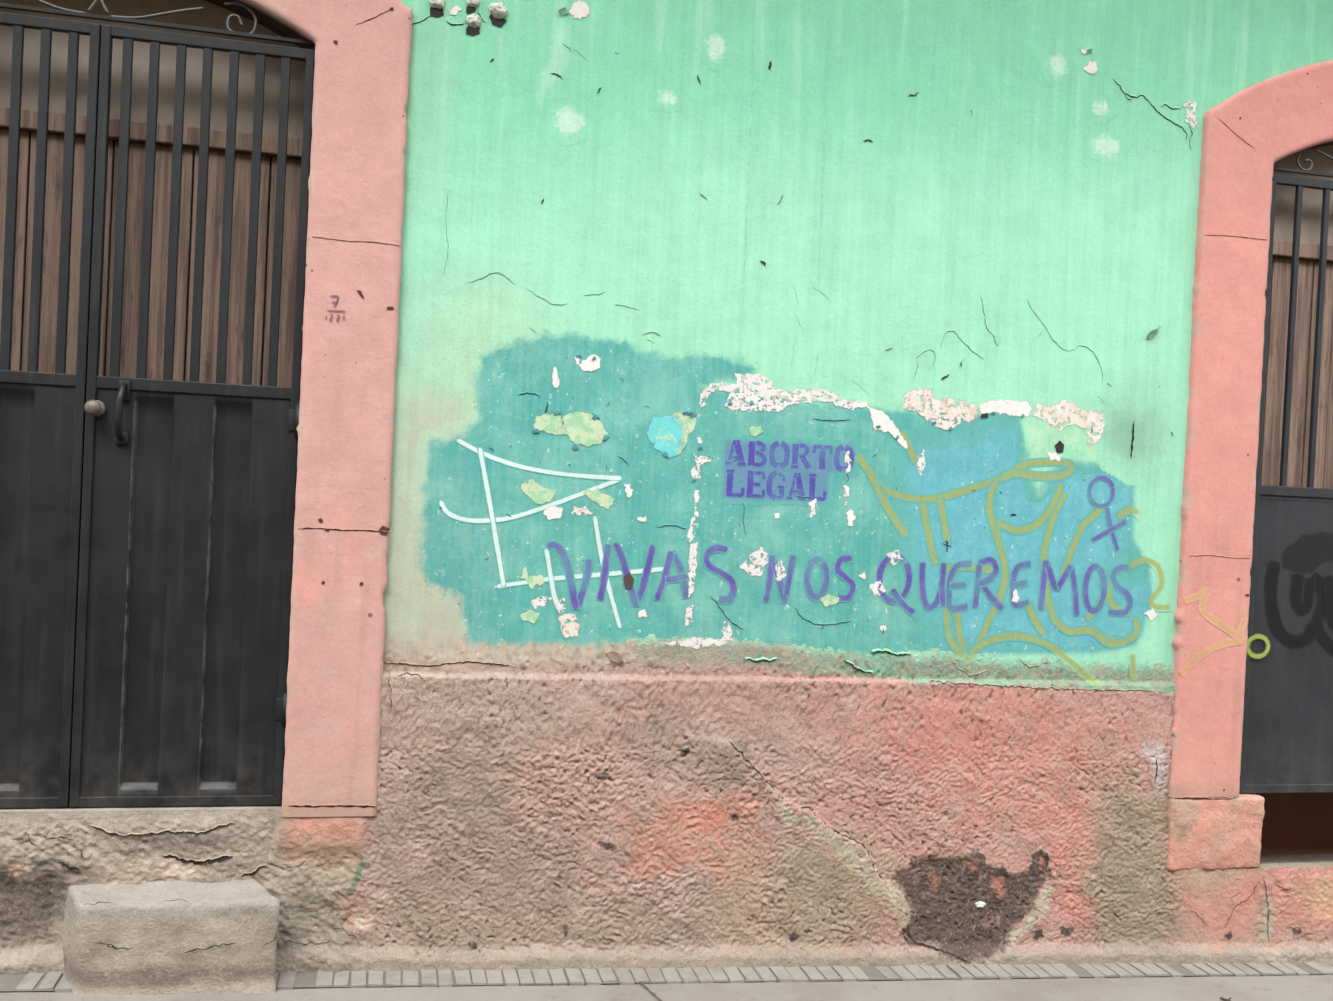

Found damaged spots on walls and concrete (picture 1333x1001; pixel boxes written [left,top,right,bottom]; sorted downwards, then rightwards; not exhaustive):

crack [1114,78,1254,149]
crack [443,189,660,343]
peeling [552,367,560,388]
peeling [575,354,601,372]
crack [913,297,1001,378]
crack [1028,299,1104,403]
peeling [532,409,609,450]
peeling [521,479,633,520]
flaking render [605,371,1175,698]
peeling [520,567,580,638]
crack [24,822,334,877]
crack [94,942,133,950]